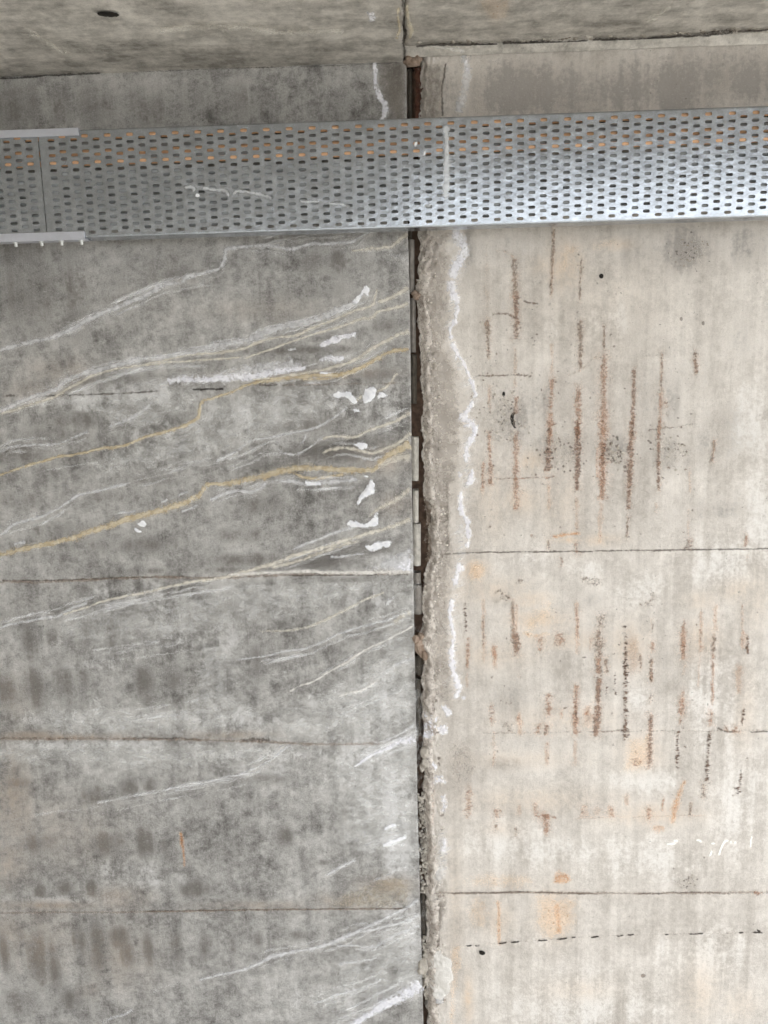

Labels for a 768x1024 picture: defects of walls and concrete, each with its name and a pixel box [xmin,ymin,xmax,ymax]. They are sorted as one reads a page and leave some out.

damp [373,63,388,119]
rust [480,259,537,355]
damp [355,230,478,767]
rust [535,364,566,478]
rust [566,326,615,499]
rust [624,369,636,509]
rust [648,354,682,491]
damp [0,518,410,628]
rust [506,603,521,652]
rust [537,616,653,740]
rust [680,623,716,796]